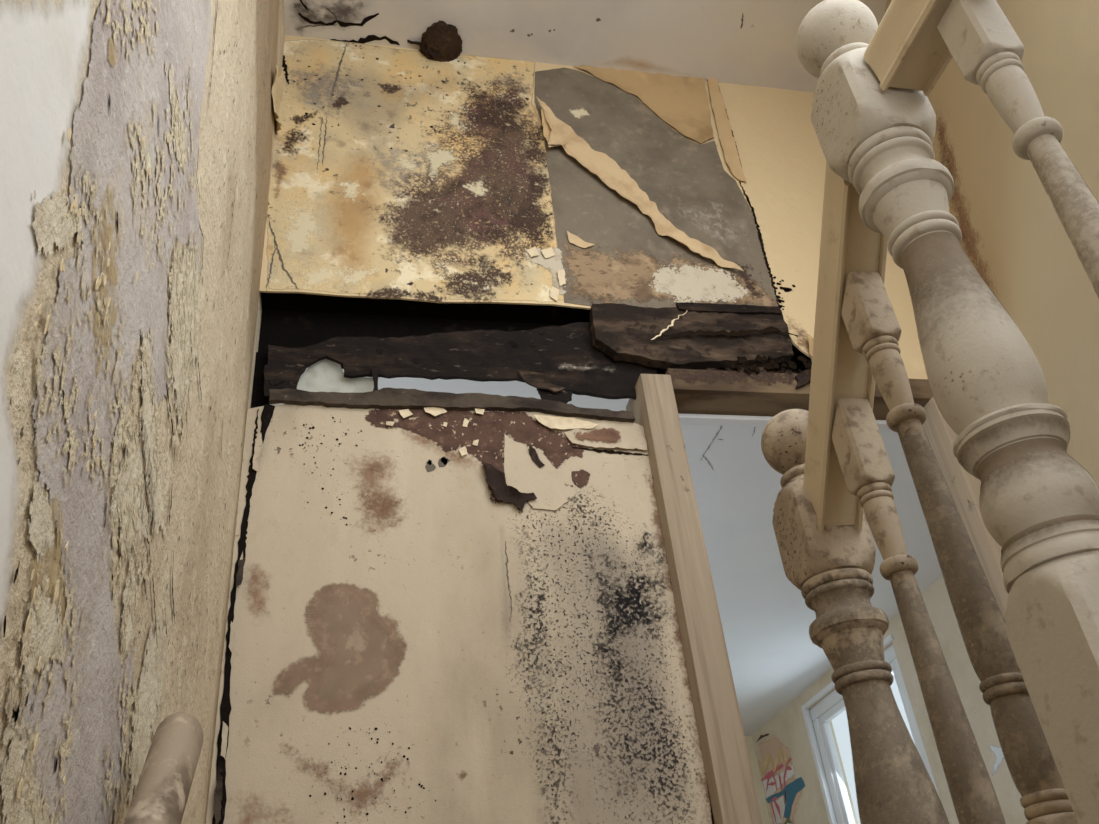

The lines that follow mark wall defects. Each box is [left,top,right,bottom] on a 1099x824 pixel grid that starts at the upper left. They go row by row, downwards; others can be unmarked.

flaking render [0,0,237,824]
crack [140,382,183,649]
crack [243,409,259,559]
crack [298,0,400,170]
damp [340,67,553,303]
peeling [365,407,598,512]
flaking render [245,67,778,415]
spalling [695,344,812,374]
damp [274,583,407,714]
damp [515,495,694,824]